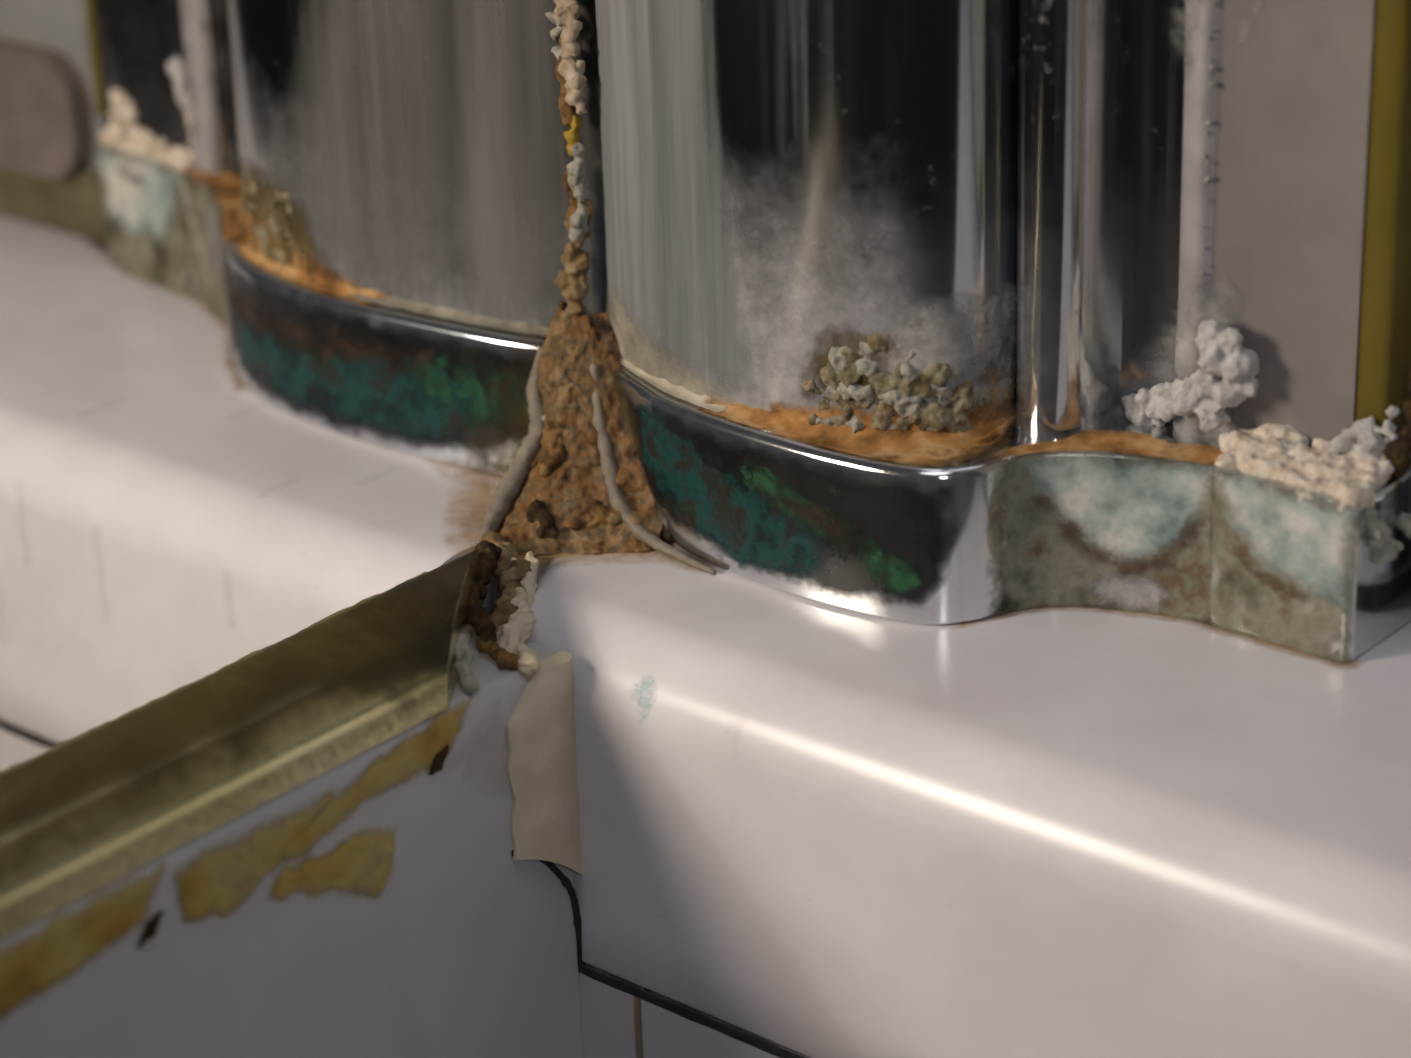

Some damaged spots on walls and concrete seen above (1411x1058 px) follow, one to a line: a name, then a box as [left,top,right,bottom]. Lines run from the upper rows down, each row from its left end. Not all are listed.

damp [101,0,190,152]
damp [801,290,1017,433]
rust [696,375,1223,466]
damp [1374,368,1411,479]
rust [0,166,949,841]
peeling [0,701,470,1020]